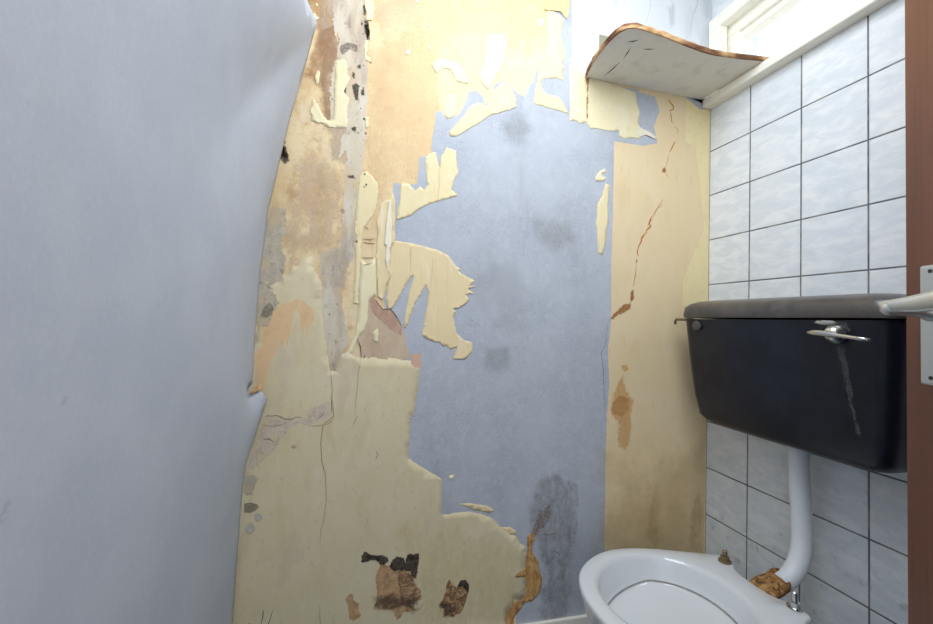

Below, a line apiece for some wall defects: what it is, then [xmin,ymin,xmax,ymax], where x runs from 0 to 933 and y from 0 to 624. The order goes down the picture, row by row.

peeling [534,0,570,113]
peeling [233,0,526,624]
leakage [612,381,633,447]
rust [505,532,542,624]